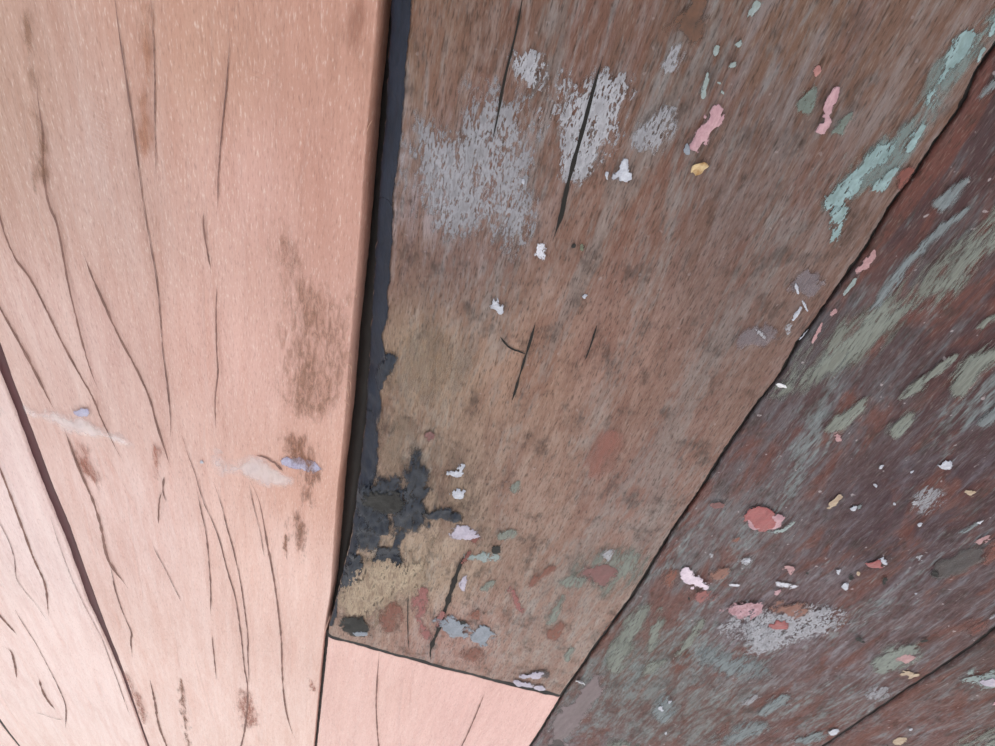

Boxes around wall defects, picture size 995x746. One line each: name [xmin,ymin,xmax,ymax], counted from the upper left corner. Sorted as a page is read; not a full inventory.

crack [553,58,603,239]
peeling [605,158,632,182]
peeling [683,72,725,176]
peeling [824,11,995,243]
crack [0,3,249,746]
water stain [296,285,338,411]
water stain [329,0,411,626]
peeling [843,250,876,296]
peeling [743,506,795,533]
crack [249,485,294,736]
peeling [664,557,852,657]
crack [373,660,381,746]